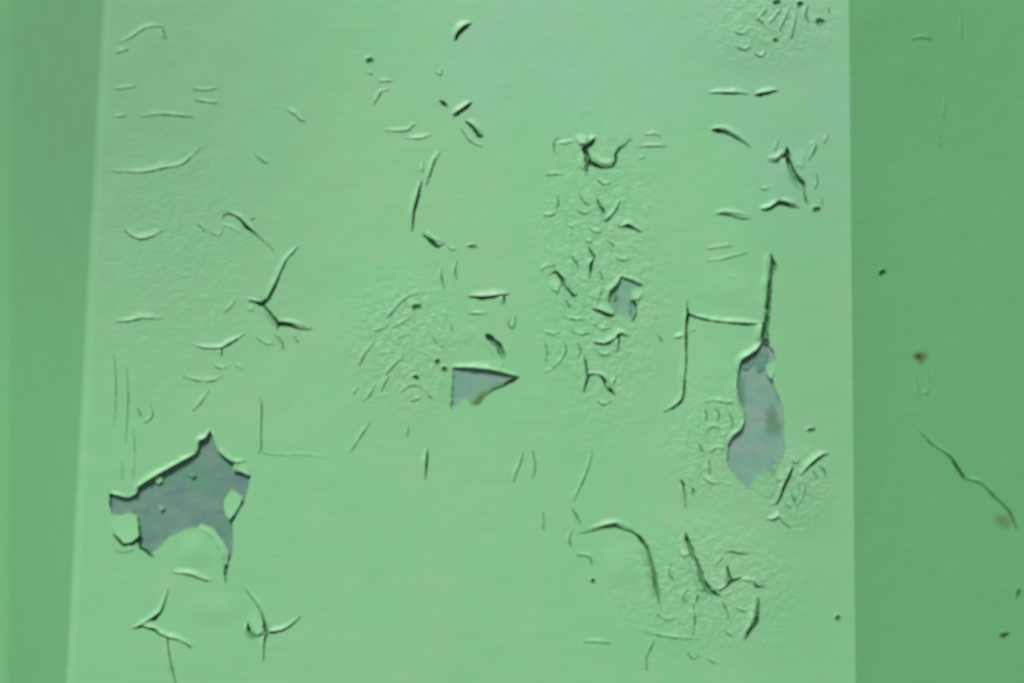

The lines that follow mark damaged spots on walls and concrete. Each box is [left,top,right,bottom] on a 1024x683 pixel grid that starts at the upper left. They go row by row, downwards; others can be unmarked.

crack [553,133,667,232]
crack [710,123,808,220]
crack [193,211,313,356]
peeling [432,356,520,409]
crack [549,246,630,396]
peeling [603,274,644,321]
crack [662,253,777,413]
peeling [727,338,786,498]
crack [113,534,213,683]
peeling [109,429,251,583]
crack [579,517,660,604]
crack [678,479,765,641]